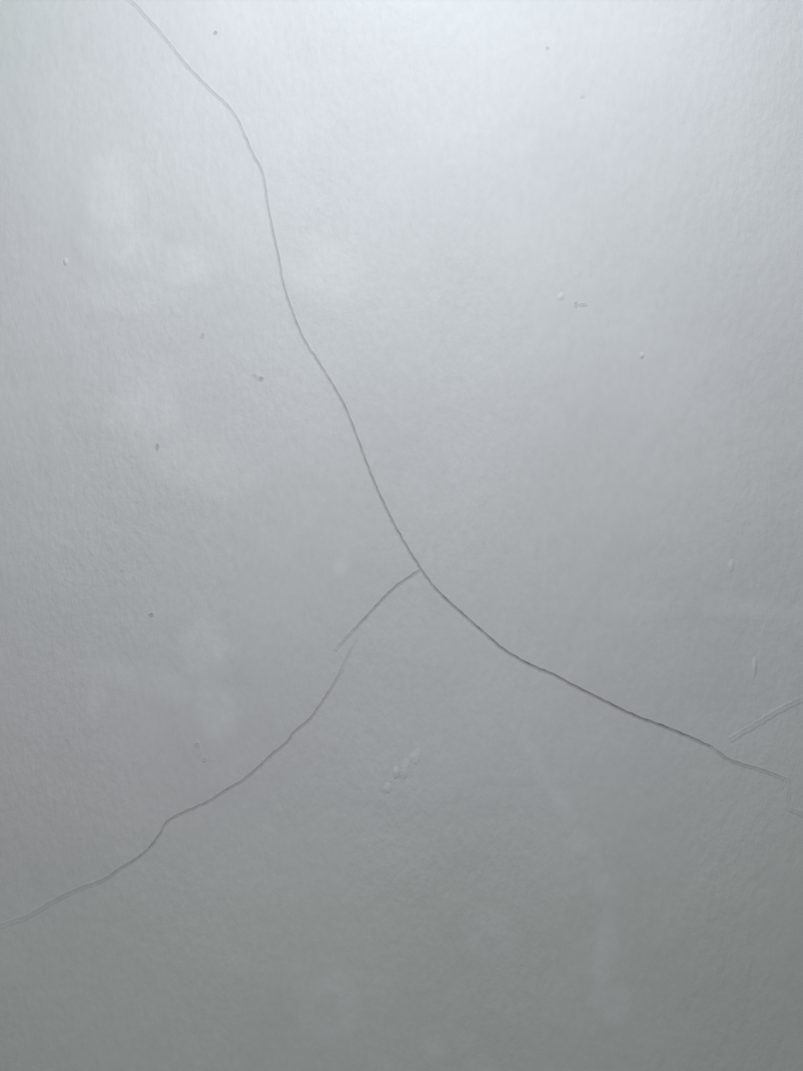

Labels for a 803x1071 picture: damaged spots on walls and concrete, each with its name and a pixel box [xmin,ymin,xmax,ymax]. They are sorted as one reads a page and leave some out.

crack [0,636,359,930]
crack [127,0,803,817]